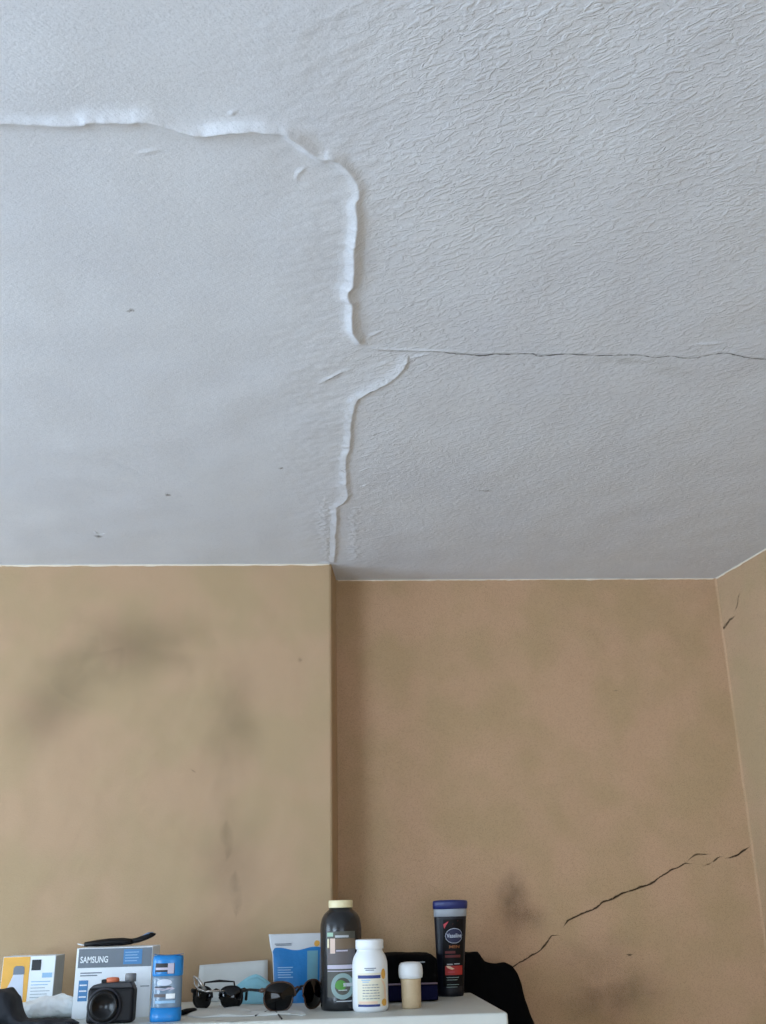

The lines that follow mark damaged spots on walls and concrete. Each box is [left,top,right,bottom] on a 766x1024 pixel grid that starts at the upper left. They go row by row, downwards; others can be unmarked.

crack [366,341,766,359]
crack [513,846,750,967]